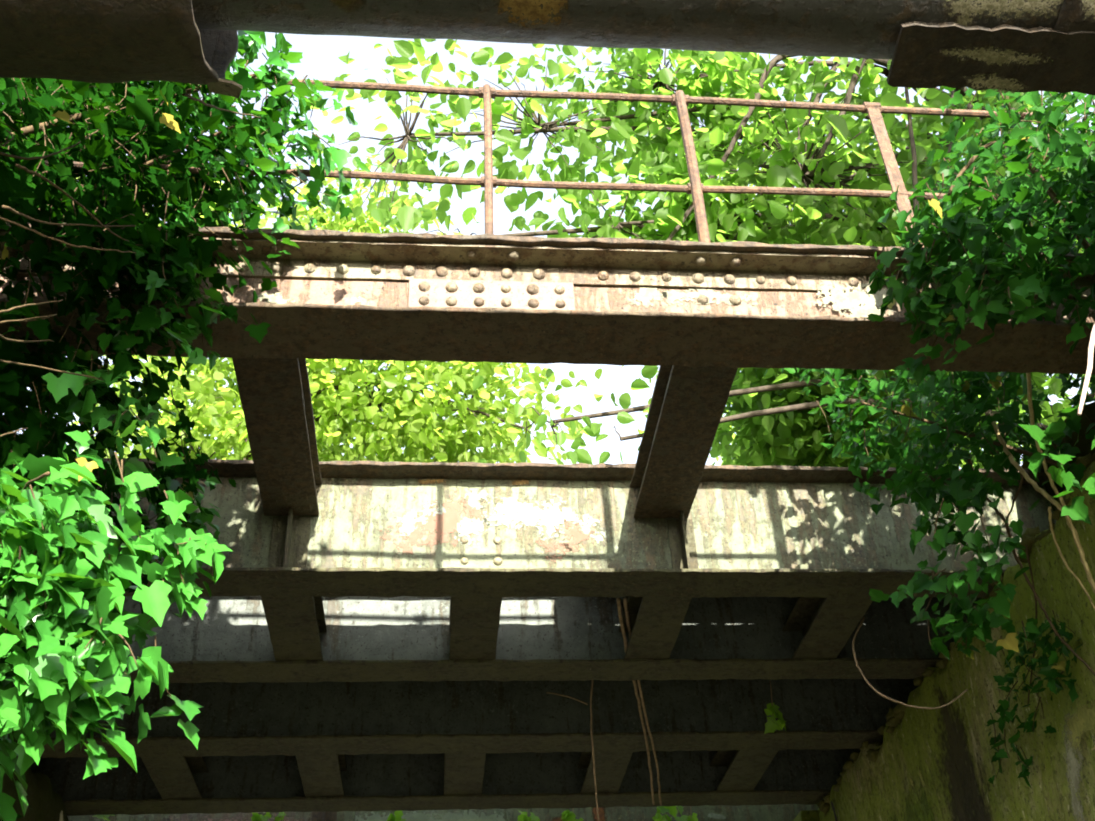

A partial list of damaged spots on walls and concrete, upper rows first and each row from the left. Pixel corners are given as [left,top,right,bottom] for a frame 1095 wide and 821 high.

peeling [379,489,607,564]
leakage [933,685,992,821]
leakage [1062,713,1095,821]